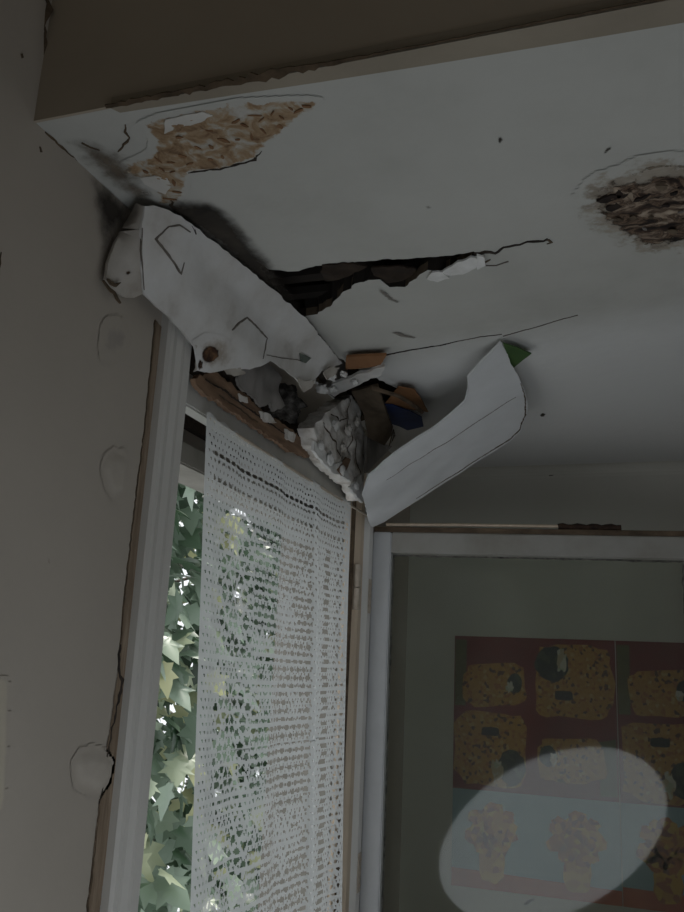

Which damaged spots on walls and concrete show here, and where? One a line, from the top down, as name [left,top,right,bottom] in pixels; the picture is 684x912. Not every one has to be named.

peeling [118,95,325,208]
spalling [571,150,684,258]
crack [473,238,553,266]
peeling [320,262,416,283]
peeling [427,254,486,282]
peeling [297,367,340,392]
peeling [348,475,364,503]